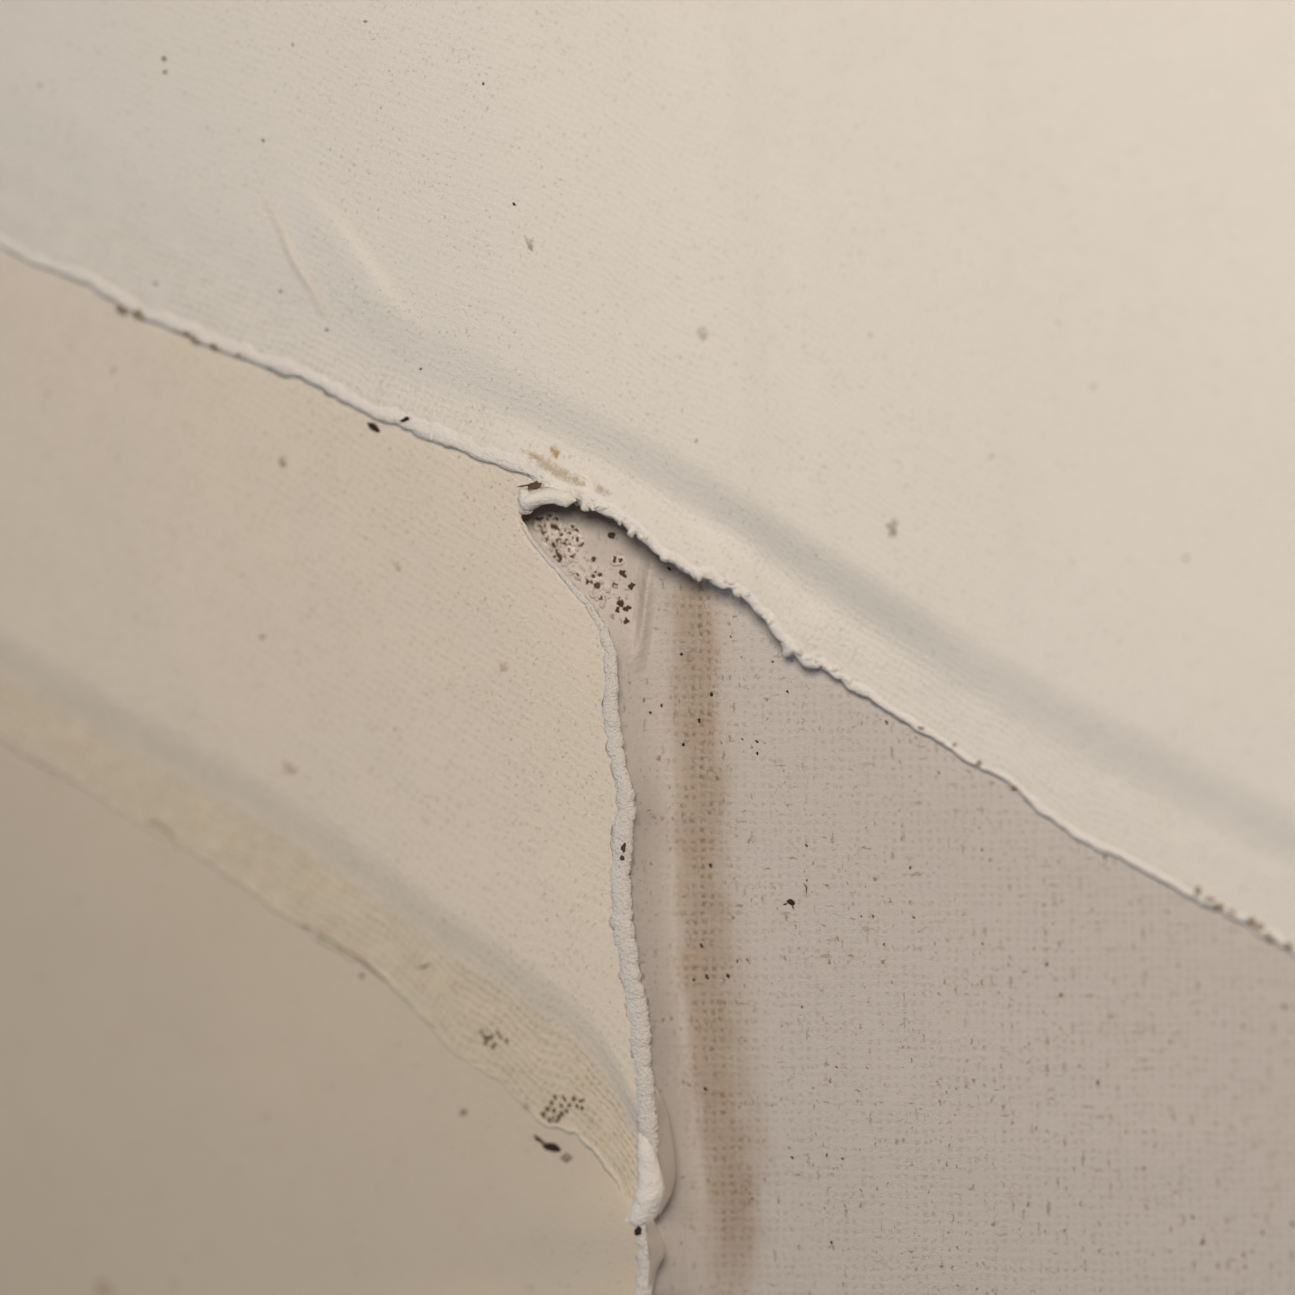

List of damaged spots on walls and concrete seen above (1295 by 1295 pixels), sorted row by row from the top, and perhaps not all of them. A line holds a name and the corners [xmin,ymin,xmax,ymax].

spalling [518,488,636,624]
peeling [480,1029,509,1049]
peeling [540,1094,585,1123]
peeling [533,1134,561,1152]
peeling [645,1219,666,1291]